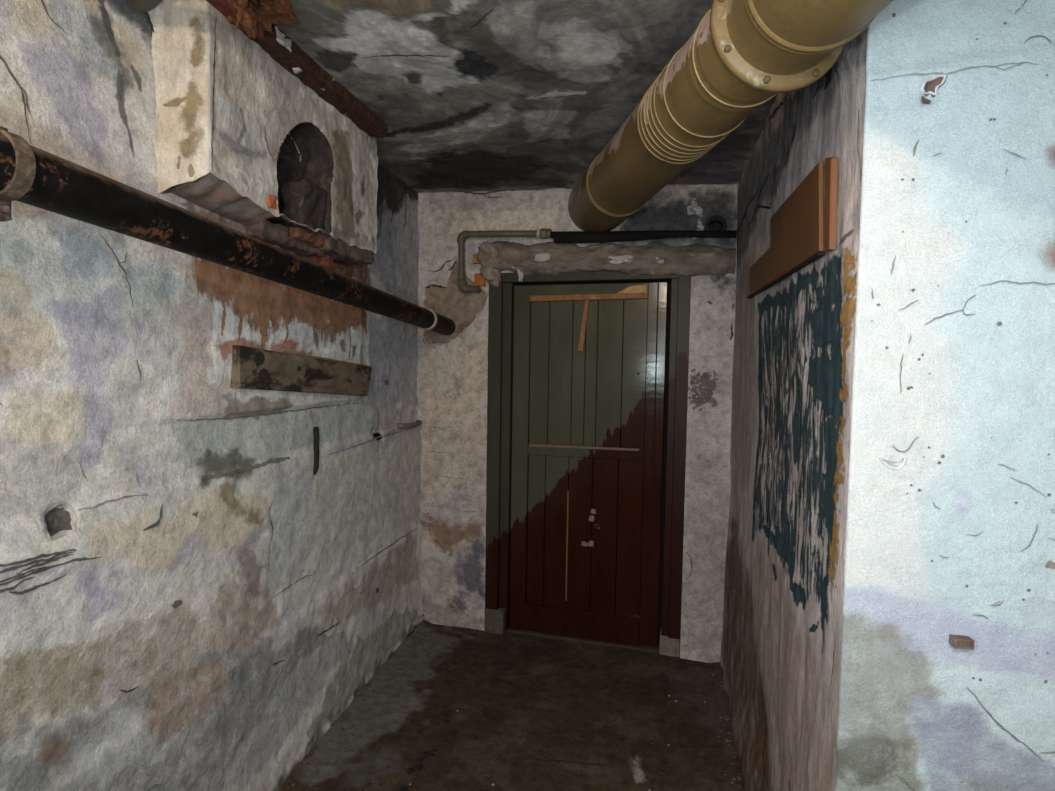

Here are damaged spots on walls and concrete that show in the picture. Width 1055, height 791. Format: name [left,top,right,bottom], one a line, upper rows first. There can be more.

crack [0,55,31,143]
corrosion [226,0,259,41]
damp [316,51,357,72]
damp [453,50,497,79]
spalling [920,72,947,104]
crack [871,35,1052,81]
damp [333,132,365,239]
corrosion [193,257,367,360]
spalling [421,254,488,347]
crack [900,280,1055,394]
peeling [752,247,857,653]
hole [43,502,78,540]